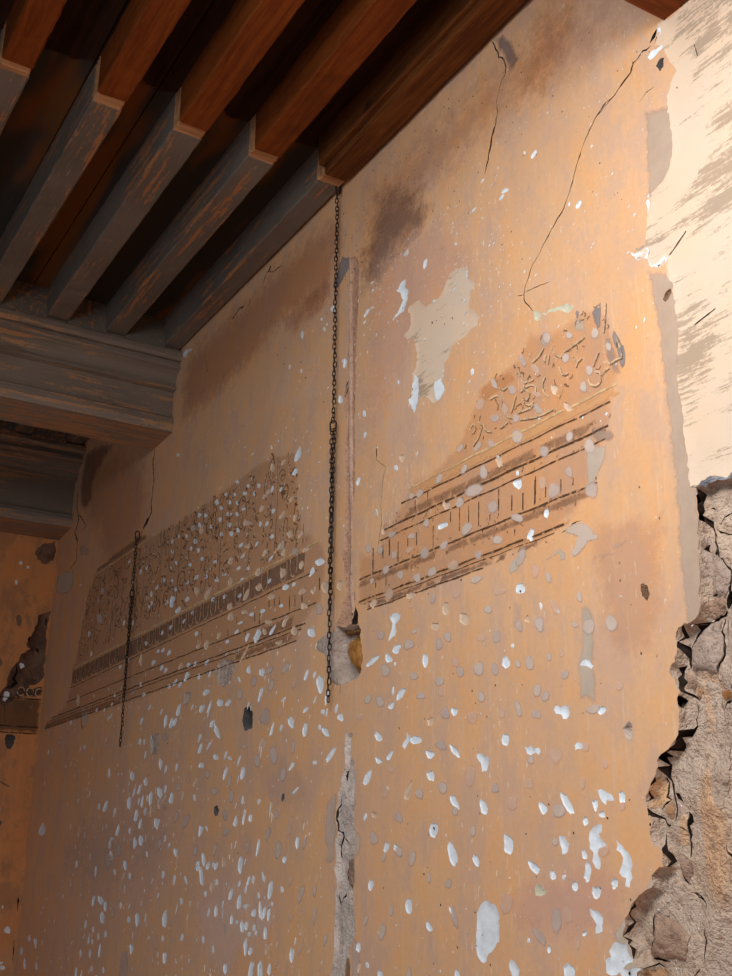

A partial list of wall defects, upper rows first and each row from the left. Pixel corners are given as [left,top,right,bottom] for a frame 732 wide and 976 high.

crack [485,42,507,172]
crack [519,29,657,311]
flaking render [393,266,479,412]
spalling [0,611,51,706]
spalling [150,607,401,770]
spalling [476,900,500,963]
spalling [559,789,632,936]